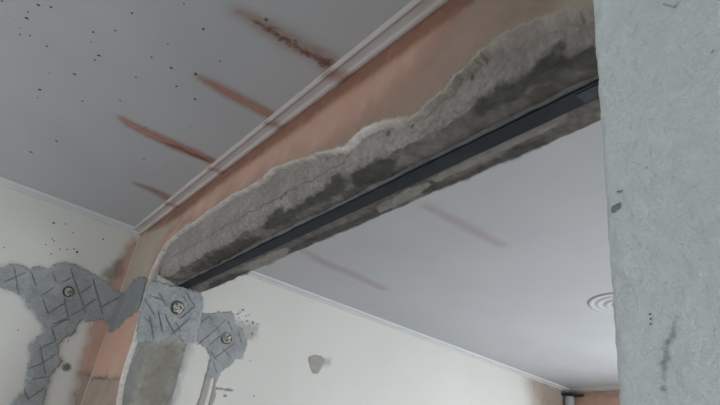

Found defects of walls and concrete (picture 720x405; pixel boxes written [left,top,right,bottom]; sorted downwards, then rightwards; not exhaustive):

rust [123,119,215,163]
crack [169,162,345,259]
rust [148,0,471,230]
leakage [152,0,539,266]
spalling [116,3,599,405]